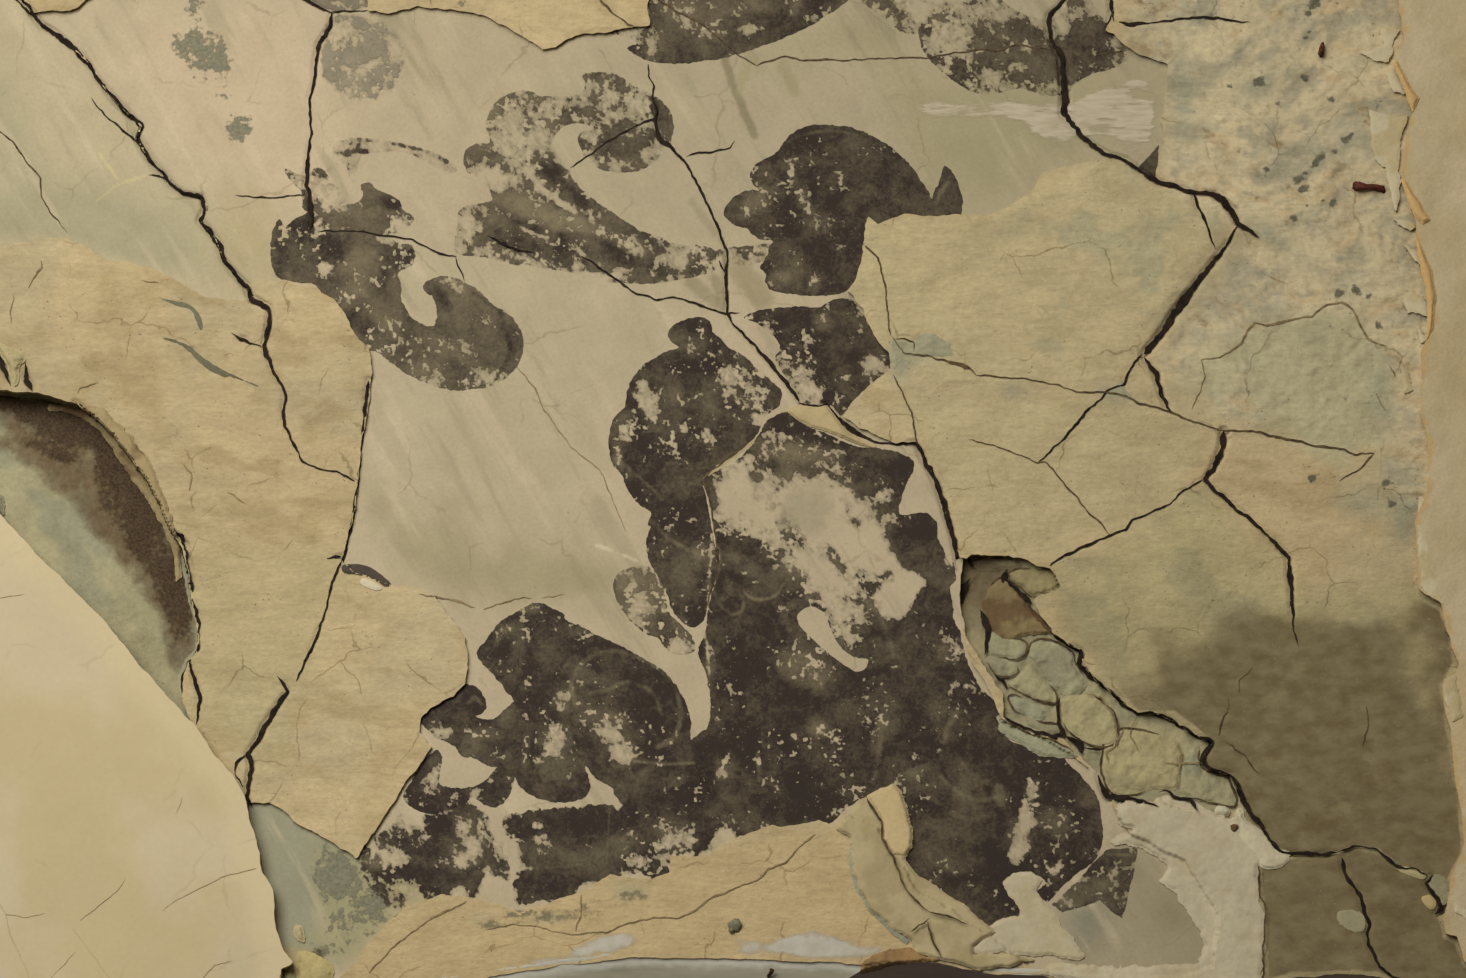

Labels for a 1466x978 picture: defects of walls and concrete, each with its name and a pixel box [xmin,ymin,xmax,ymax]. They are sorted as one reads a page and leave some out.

crack [0,355,32,390]
crack [16,0,464,808]
peeling [313,256,386,316]
crack [570,0,1395,646]
spalling [0,391,197,720]
peeling [247,680,678,978]
peeling [619,752,750,879]
crack [866,797,966,958]
peeling [1006,777,1083,866]
crack [1003,634,1444,978]
damp [1154,605,1466,978]
spalling [1394,866,1466,919]